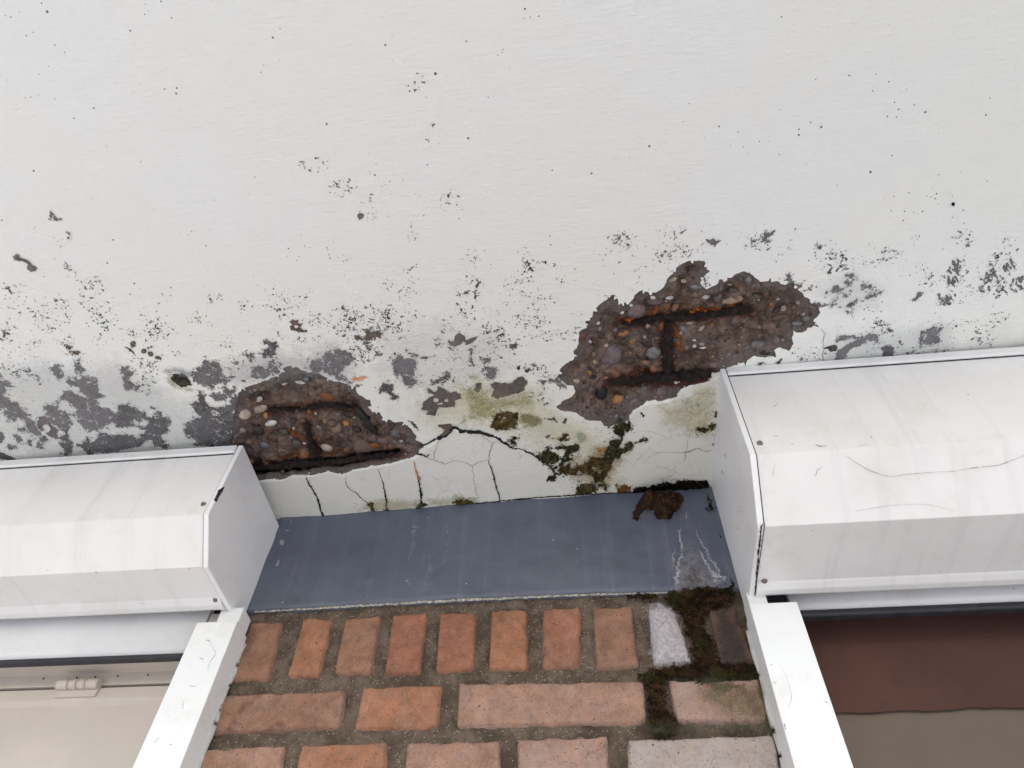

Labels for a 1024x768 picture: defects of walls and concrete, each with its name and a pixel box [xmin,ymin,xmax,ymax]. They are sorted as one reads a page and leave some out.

spalling [0,224,1024,481]
corrosion [608,303,751,390]
corrosion [251,402,398,472]
crack [306,426,629,516]
damp [466,376,542,426]